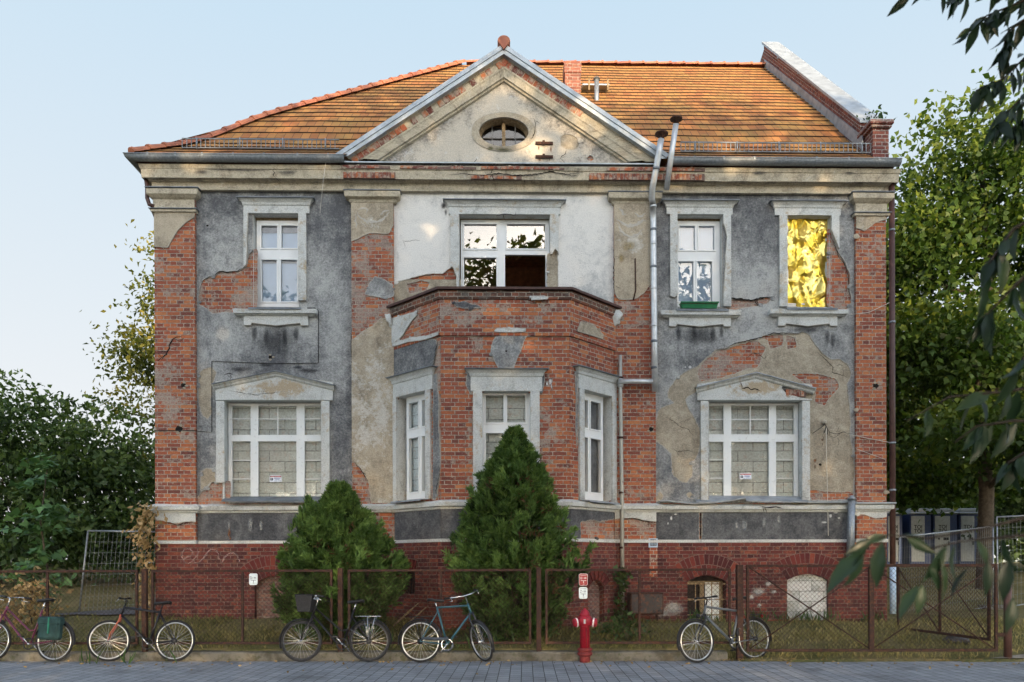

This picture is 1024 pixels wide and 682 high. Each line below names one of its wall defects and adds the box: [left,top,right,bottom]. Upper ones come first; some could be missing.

flaking render [560,135,705,182]
flaking render [154,218,258,540]
damp [253,330,297,349]
flaking render [351,225,461,503]
flaking render [489,327,530,368]
flaking render [577,221,890,540]